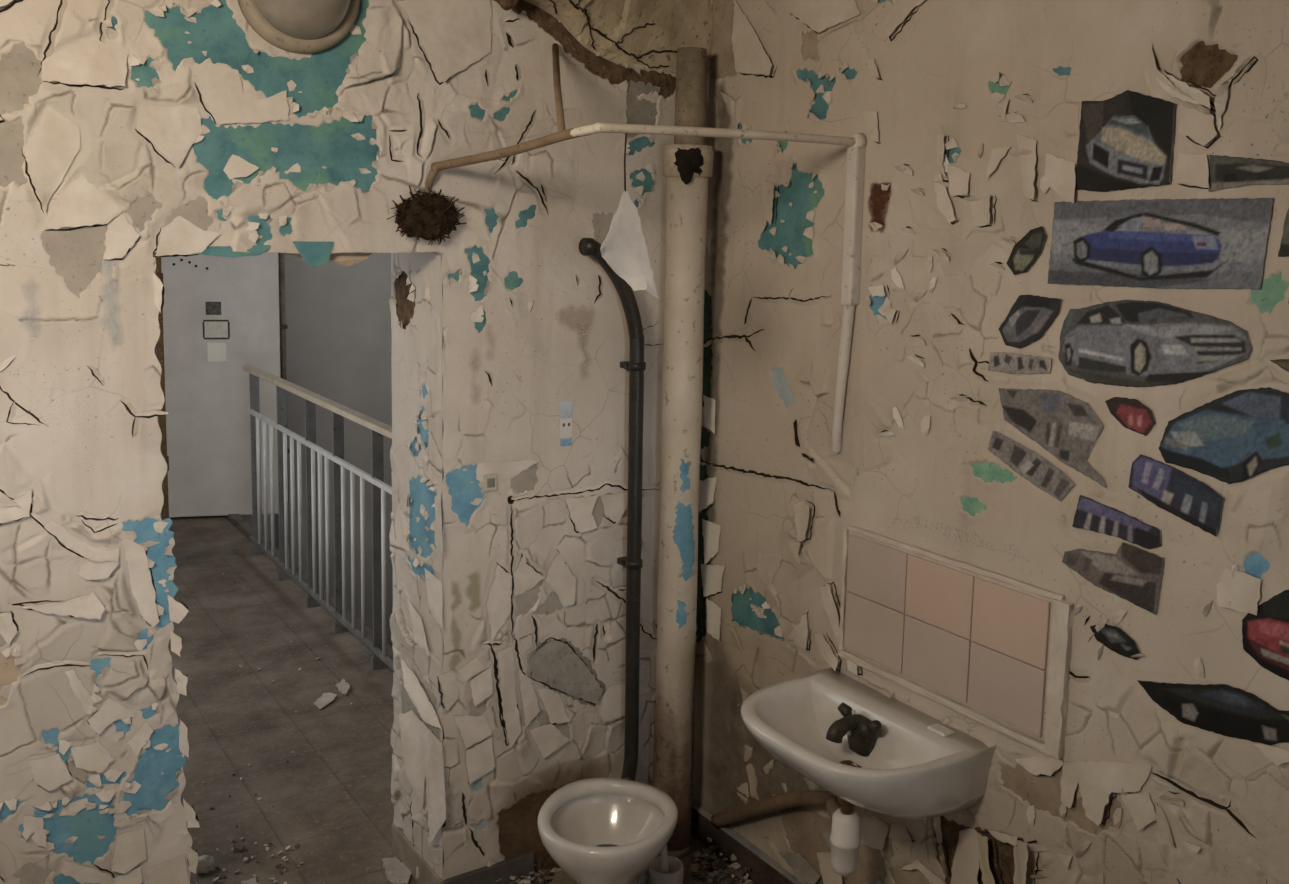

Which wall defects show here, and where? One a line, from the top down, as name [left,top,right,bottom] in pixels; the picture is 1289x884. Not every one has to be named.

flaking render [512,0,676,99]
peeling [0,0,381,313]
peeling [447,208,523,333]
rust [868,183,891,231]
peeling [0,518,189,706]
peeling [0,657,200,884]
peeling [403,460,539,652]
peeling [399,549,625,843]
flaking render [470,788,561,874]
crack [484,480,661,745]
crack [700,419,841,517]
peeling [778,754,1201,884]